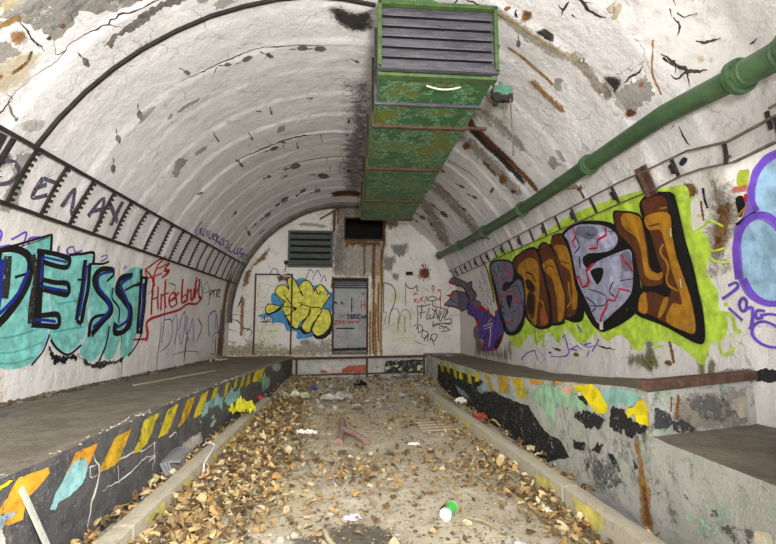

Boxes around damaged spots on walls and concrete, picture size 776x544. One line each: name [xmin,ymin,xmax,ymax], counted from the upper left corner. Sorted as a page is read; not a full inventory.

spalling [0,40,21,63]
rust [0,16,27,45]
spalling [0,0,143,41]
crack [0,0,159,114]
spalling [106,0,186,49]
rust [508,47,565,112]
crack [498,0,606,53]
spalling [614,77,655,113]
crack [661,54,707,87]
crack [669,0,721,44]
rust [345,221,387,356]
rust [635,440,653,531]